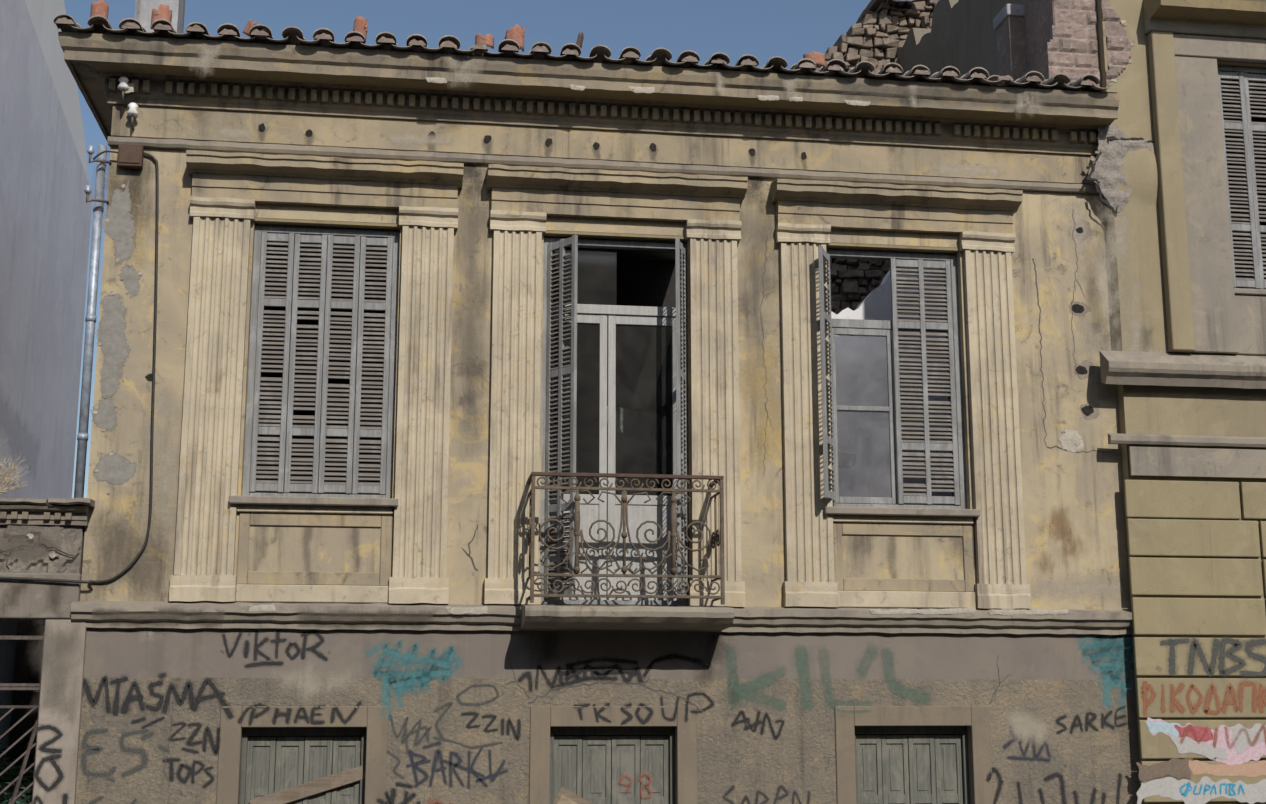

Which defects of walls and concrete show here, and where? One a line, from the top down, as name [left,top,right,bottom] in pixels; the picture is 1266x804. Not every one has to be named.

flaking render [1089,124,1156,212]
crack [1071,136,1155,375]
peeling [90,182,143,431]
spalling [1069,301,1091,316]
crack [1032,258,1116,453]
spalling [1074,360,1095,380]
flaking render [1059,401,1100,453]
peeling [93,450,136,494]
crack [0,543,74,556]
crack [462,525,478,571]